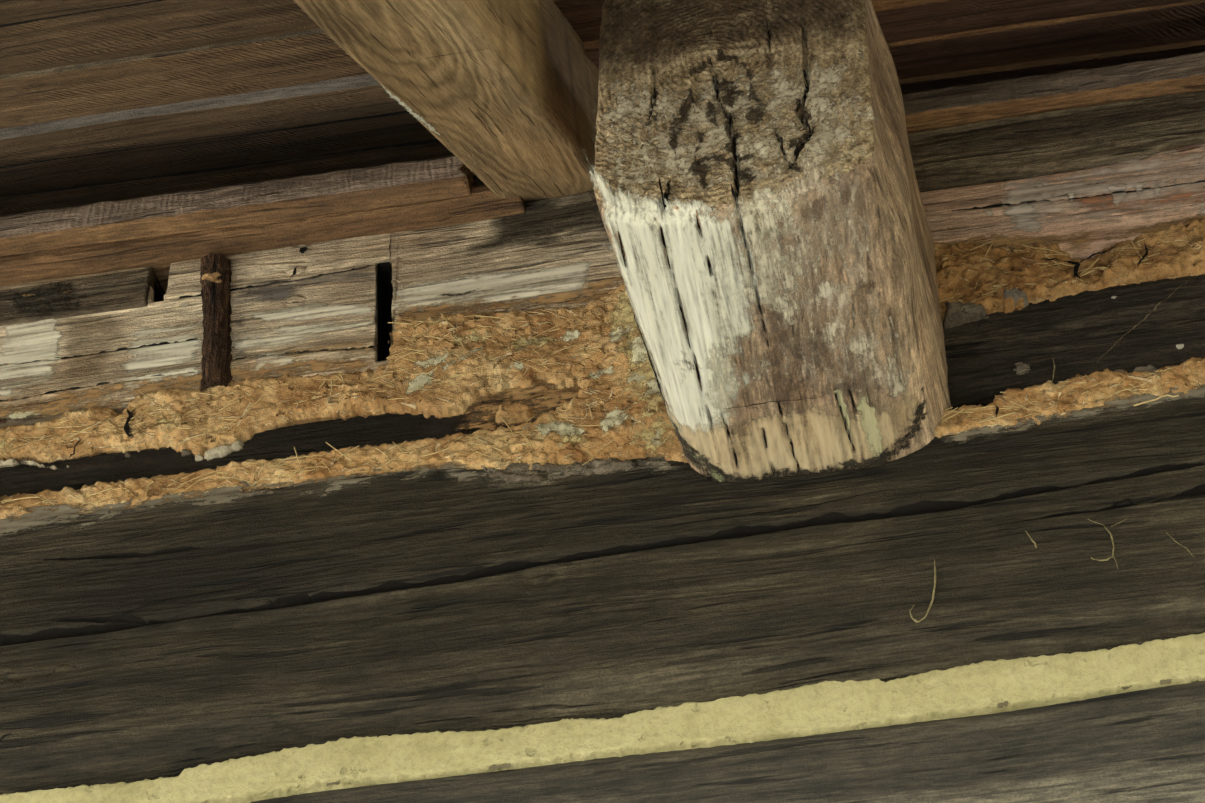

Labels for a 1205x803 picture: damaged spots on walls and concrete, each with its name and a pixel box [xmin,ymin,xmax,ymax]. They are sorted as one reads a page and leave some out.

crack [710,22,769,347]
crack [775,27,813,169]
crack [0,463,1205,646]